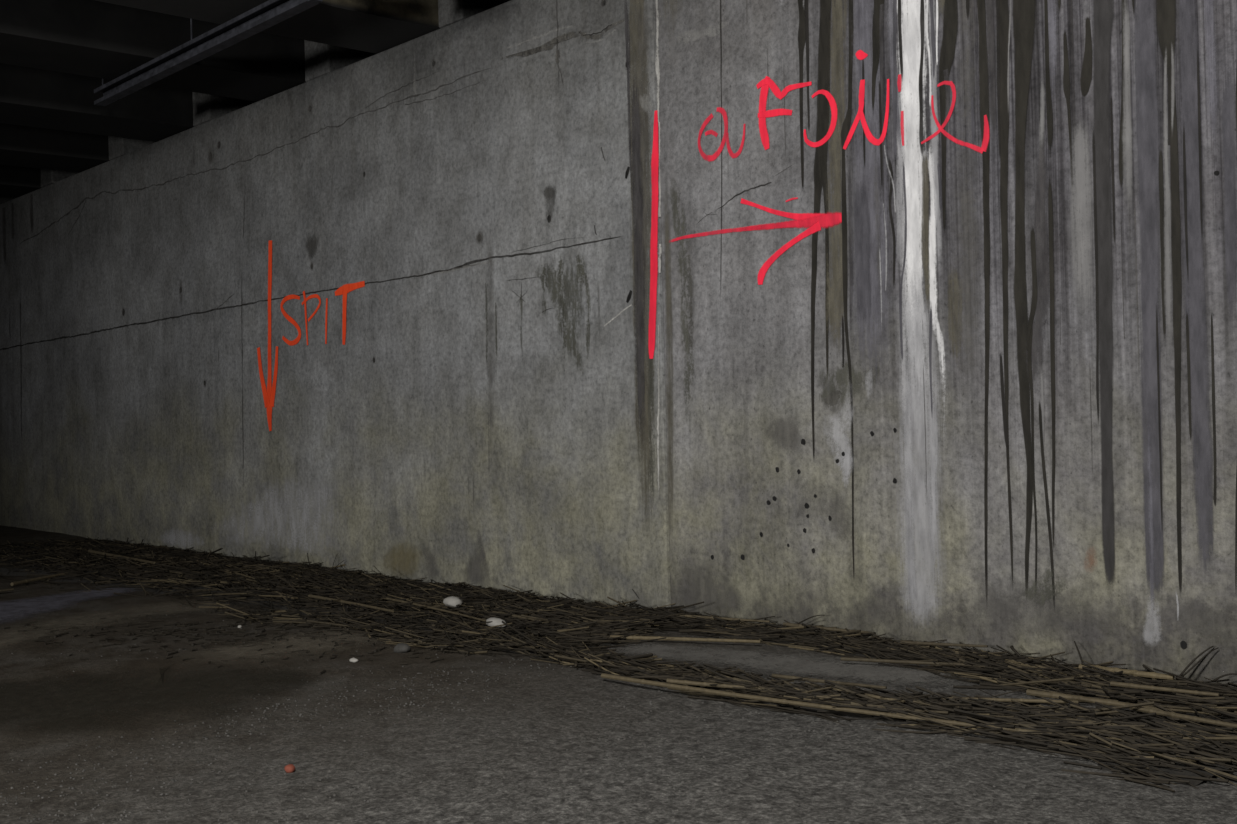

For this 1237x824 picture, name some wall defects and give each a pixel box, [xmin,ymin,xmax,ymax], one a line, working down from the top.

crack [0,237,618,416]
water stain [538,255,590,365]
water stain [625,0,693,505]
water stain [775,0,1237,641]